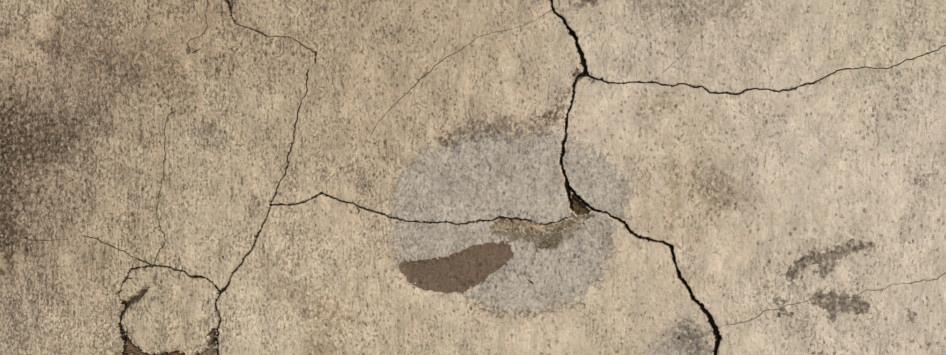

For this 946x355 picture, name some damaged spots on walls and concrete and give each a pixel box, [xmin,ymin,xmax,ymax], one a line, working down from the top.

crack [187,0,209,53]
crack [225,0,317,63]
crack [370,32,494,137]
crack [85,69,576,355]
peeling [386,124,633,321]
crack [499,0,946,355]
flaking render [126,287,150,310]
flaking render [115,328,218,355]